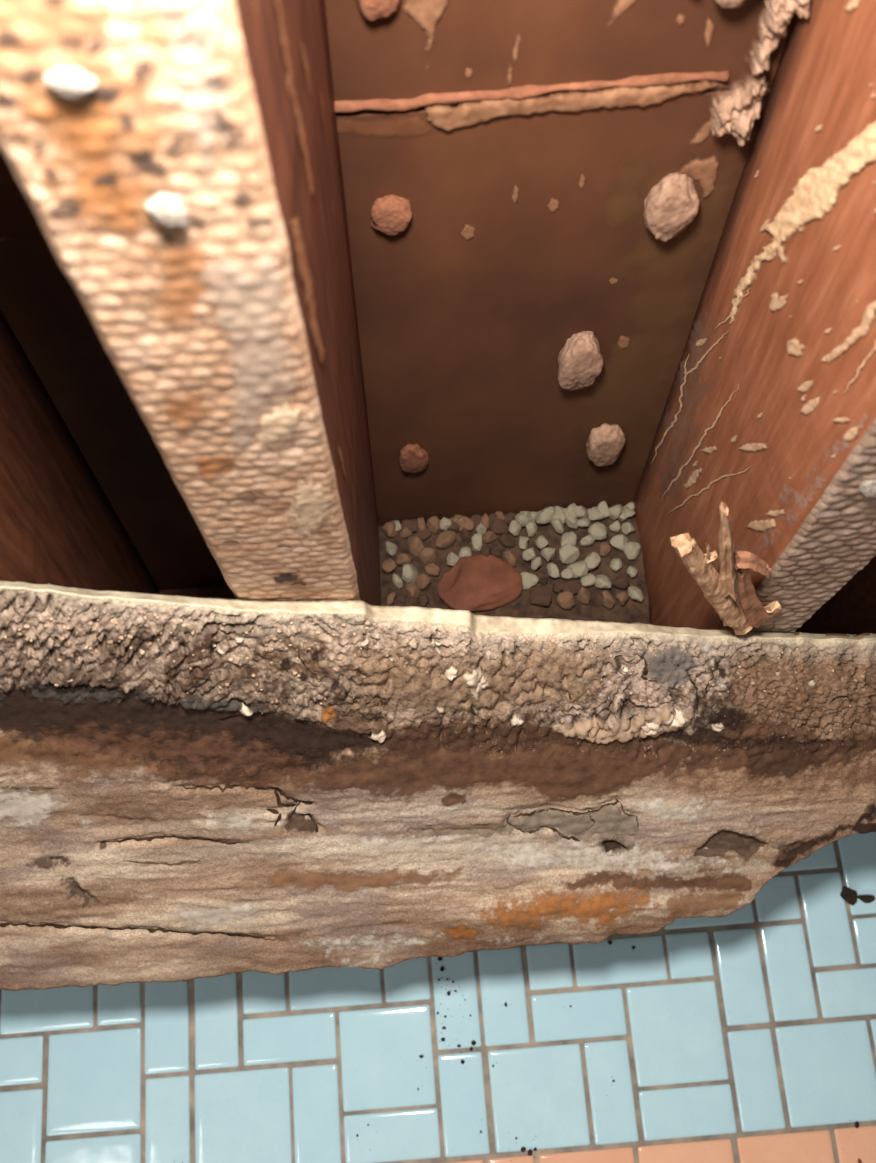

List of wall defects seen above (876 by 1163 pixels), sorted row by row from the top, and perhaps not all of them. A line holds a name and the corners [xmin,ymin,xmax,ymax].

peeling [337,81,721,136]
rust [28,97,143,231]
rust [163,247,205,327]
spalling [280,636,726,744]
damp [0,680,876,831]
crack [79,813,248,865]
crack [179,784,318,833]
damp [269,832,739,892]
peeling [408,798,639,853]
crack [0,923,285,941]
damp [305,932,425,967]
rust [441,871,752,939]